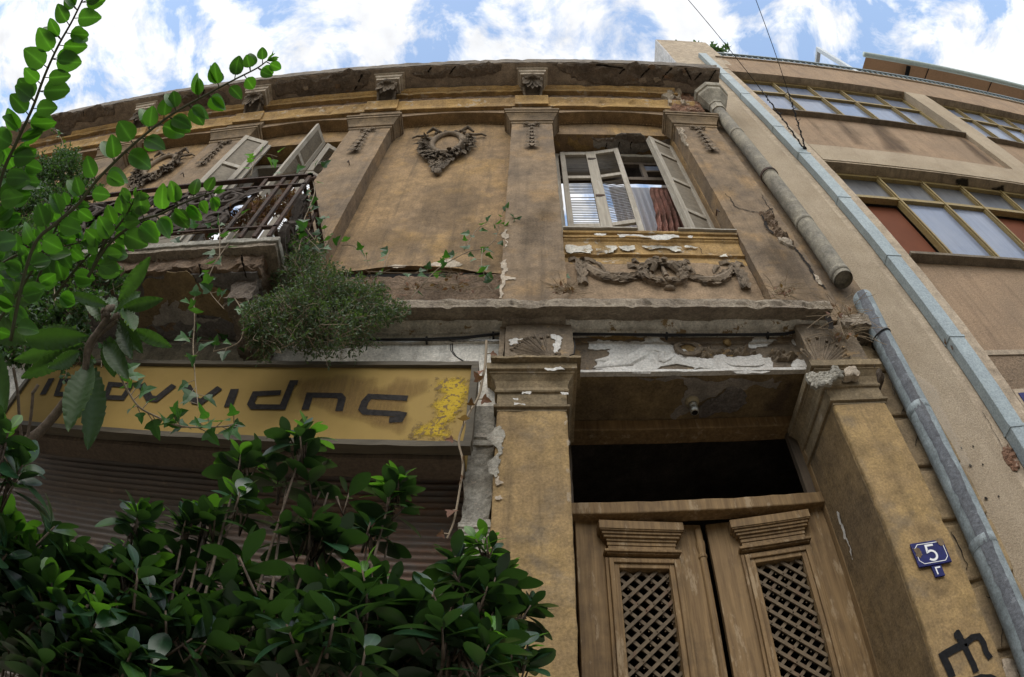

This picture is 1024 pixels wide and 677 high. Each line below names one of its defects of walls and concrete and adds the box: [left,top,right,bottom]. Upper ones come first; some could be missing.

crack [596,64,716,81]
peeling [565,233,703,254]
peeling [499,229,516,298]
peeling [138,271,233,328]
peeling [551,334,562,353]
peeling [586,336,776,375]
spalling [791,359,861,391]
peeling [487,426,505,500]